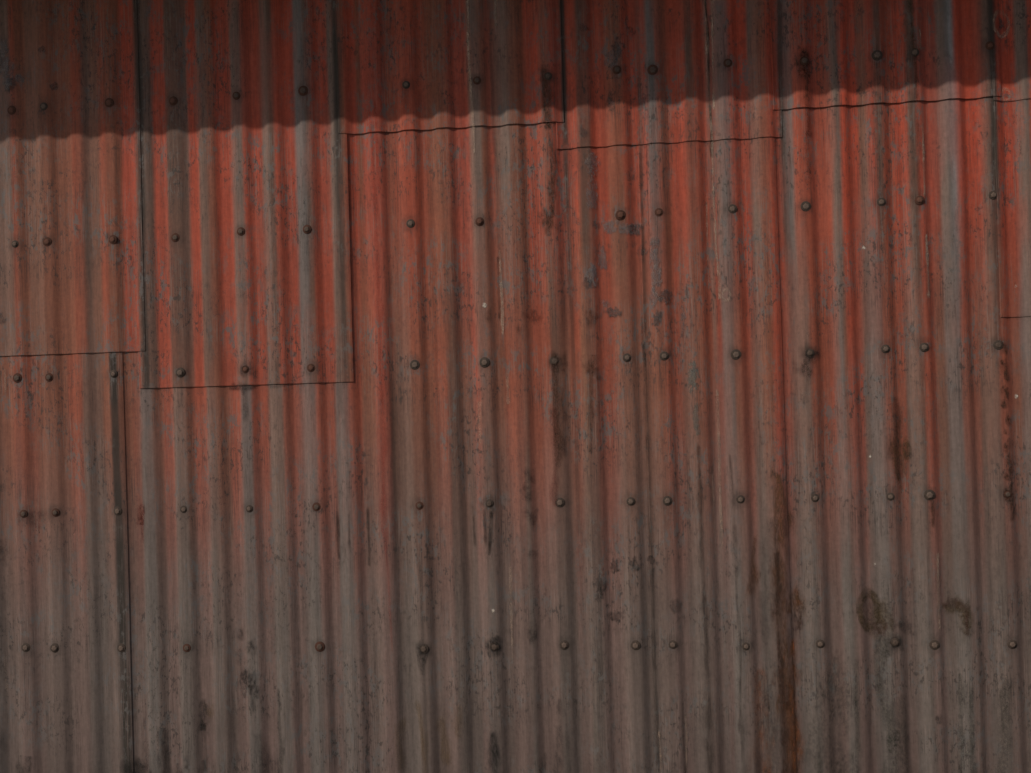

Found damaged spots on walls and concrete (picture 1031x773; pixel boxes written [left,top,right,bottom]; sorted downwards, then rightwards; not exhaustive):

corrosion [772,475,802,773]